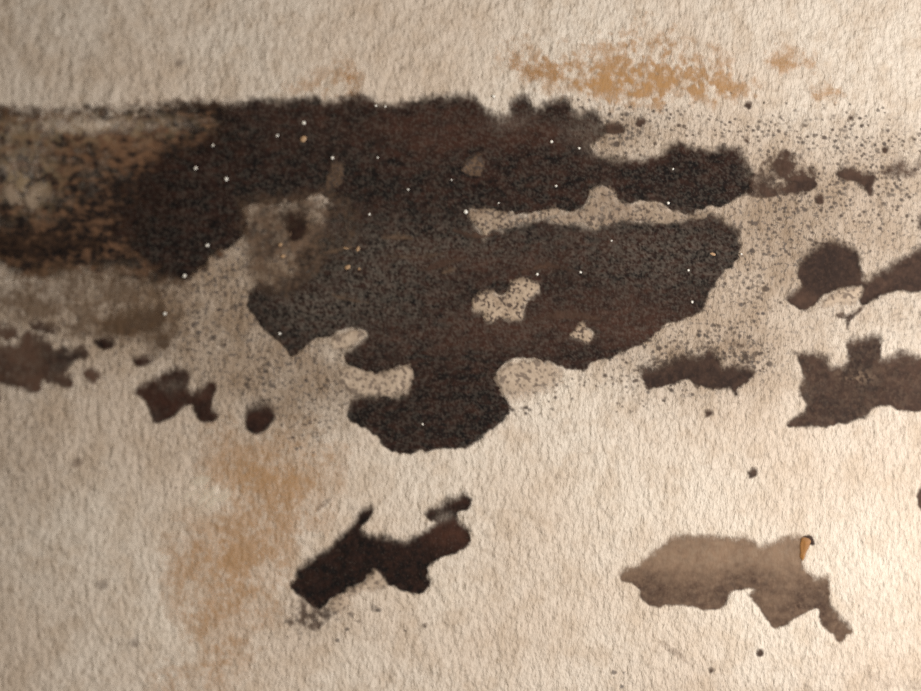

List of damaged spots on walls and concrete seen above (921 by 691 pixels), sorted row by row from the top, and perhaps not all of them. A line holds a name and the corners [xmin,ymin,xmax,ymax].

leakage [0,94,921,454]
leakage [289,495,472,629]
leakage [621,535,852,642]